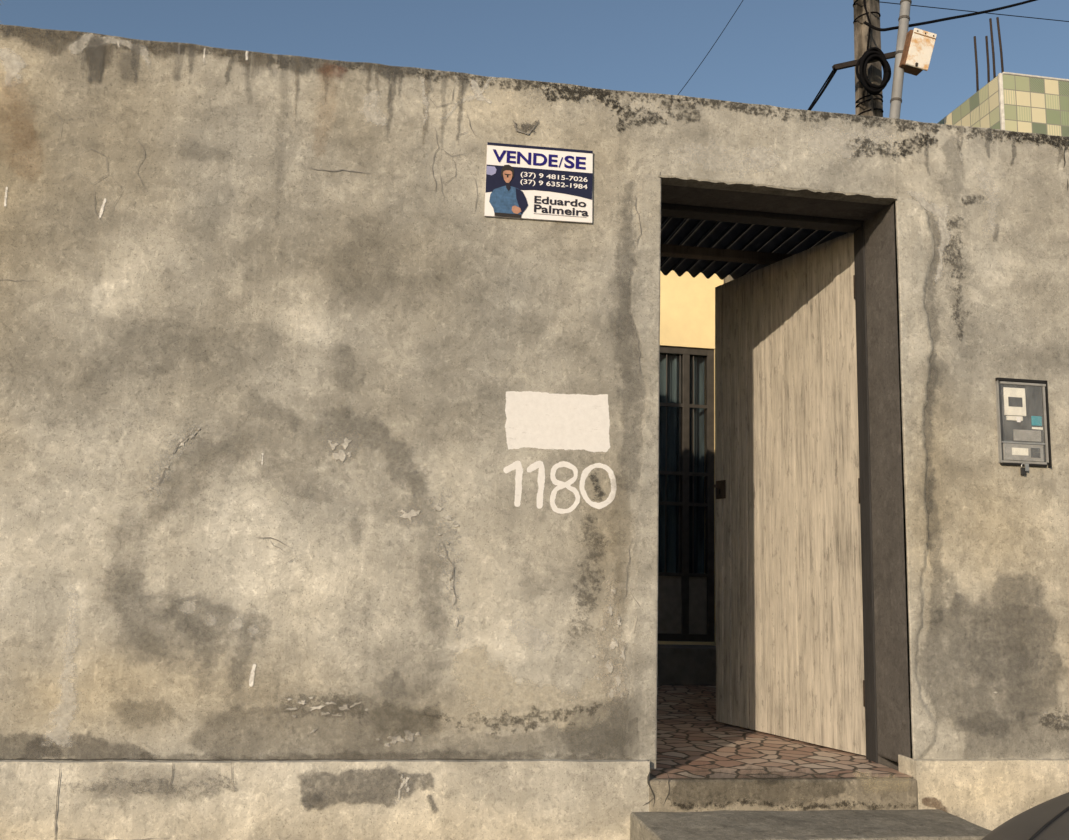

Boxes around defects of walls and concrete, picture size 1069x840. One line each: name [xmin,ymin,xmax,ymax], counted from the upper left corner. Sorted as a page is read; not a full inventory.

water stain [0,24,951,157]
water stain [964,127,1069,150]
spalling [286,697,369,734]
spalling [376,730,421,748]
water stain [303,770,434,810]